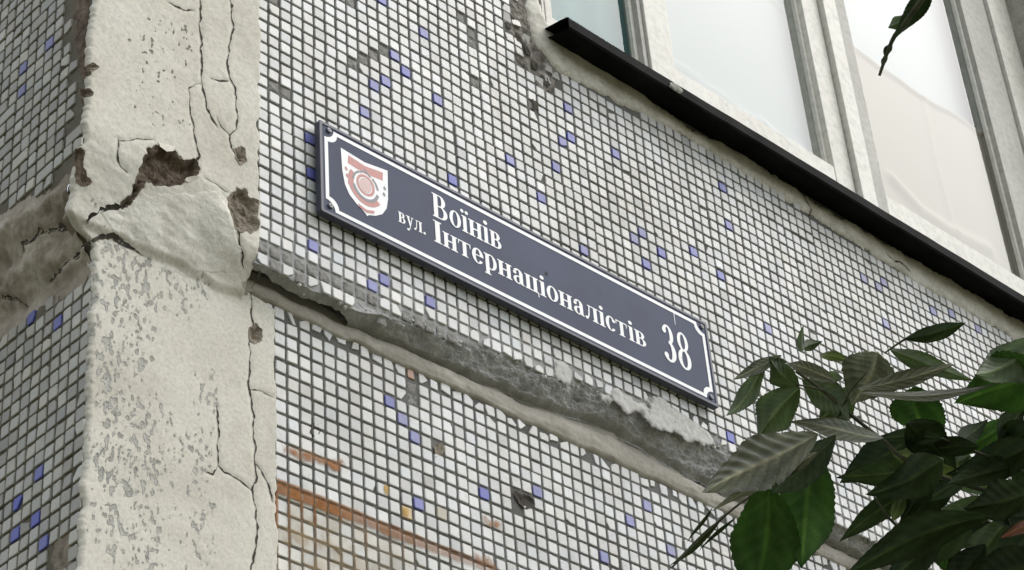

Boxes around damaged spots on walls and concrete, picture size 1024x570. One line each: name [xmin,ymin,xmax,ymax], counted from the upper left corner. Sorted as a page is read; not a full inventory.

spalling [502,0,557,112]
crack [169,0,239,192]
crack [117,138,153,173]
spalling [121,142,200,210]
spalling [228,187,738,486]
crack [208,229,273,570]
rust [290,449,343,471]
rust [275,479,414,544]
spalling [513,491,535,509]
spalling [824,492,897,559]